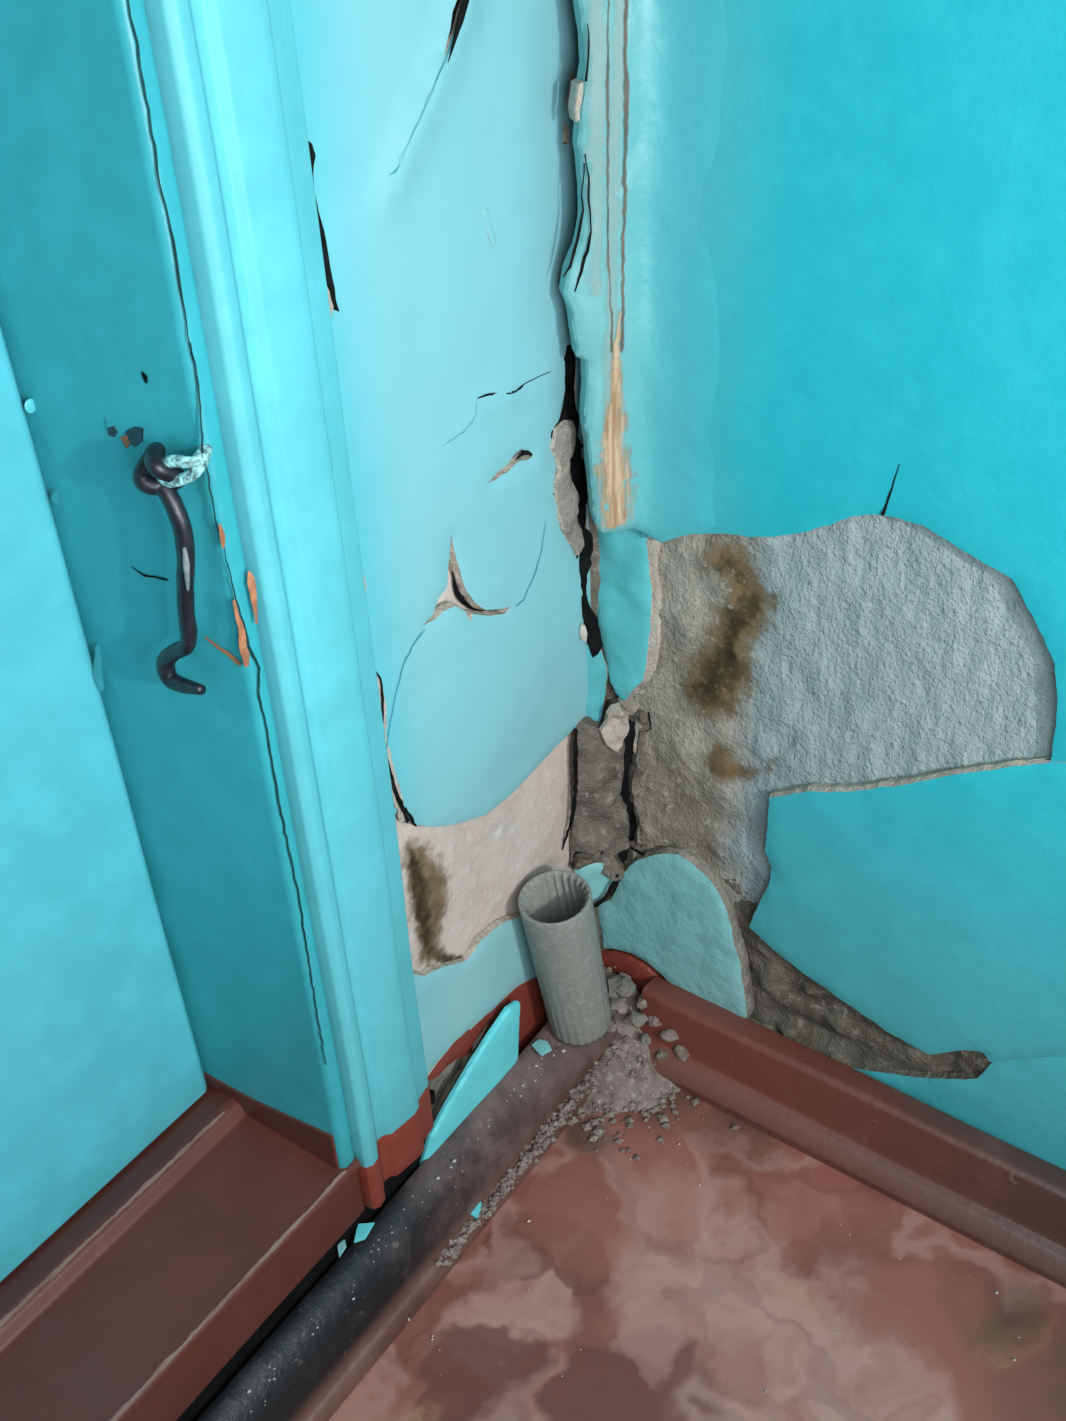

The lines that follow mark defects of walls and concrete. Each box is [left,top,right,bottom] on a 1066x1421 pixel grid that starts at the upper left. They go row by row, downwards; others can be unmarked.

crack [308,141,340,315]
crack [390,0,470,175]
crack [563,24,592,292]
rust [596,0,632,529]
crack [127,0,327,1065]
crack [443,344,652,908]
water stain [684,545,777,718]
crack [376,632,424,826]
flaking render [395,514,1057,1073]
water stain [709,746,771,779]
water stain [407,843,463,965]
flaking render [428,1056,464,1119]